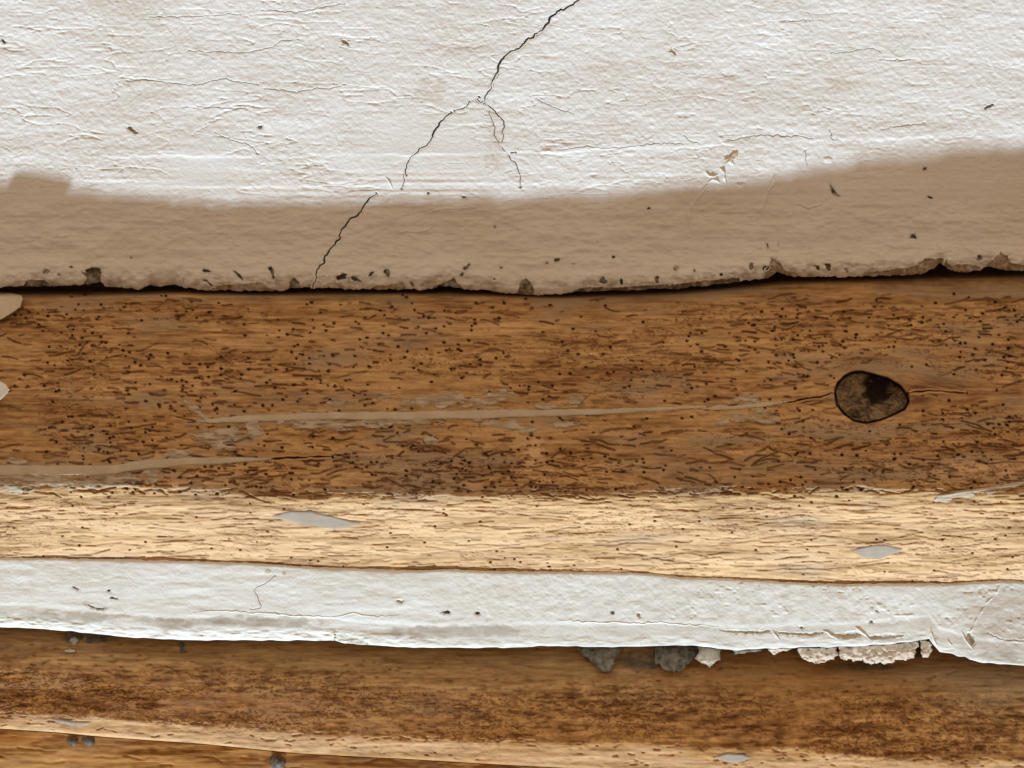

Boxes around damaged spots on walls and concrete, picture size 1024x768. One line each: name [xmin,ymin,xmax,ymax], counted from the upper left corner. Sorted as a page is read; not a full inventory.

crack [310,0,581,289]
peeling [0,265,103,320]
spalling [200,265,303,291]
spalling [335,267,415,290]
spalling [430,261,472,289]
spalling [516,276,537,295]
spalling [565,242,800,293]
spalling [812,261,833,273]
spalling [859,251,1024,277]